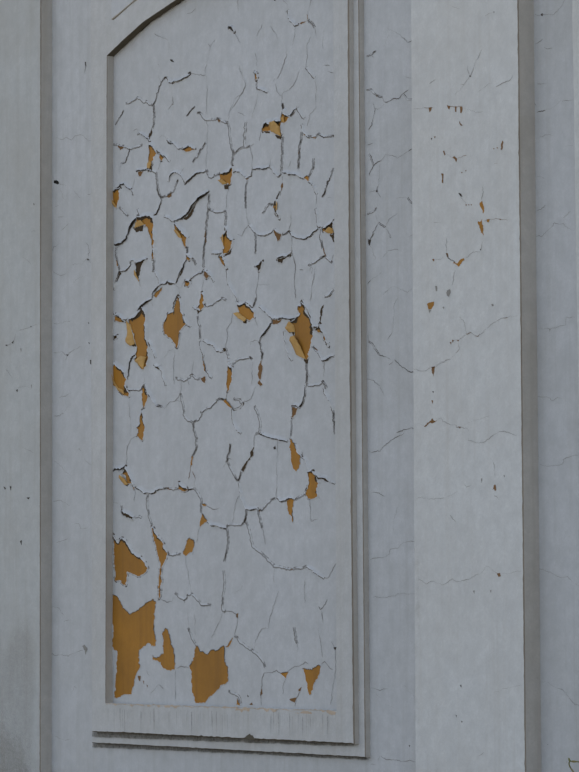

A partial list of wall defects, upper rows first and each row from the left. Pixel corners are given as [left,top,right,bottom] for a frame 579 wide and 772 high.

crack [113,247,131,291]
peeling [112,283,163,442]
peeling [112,106,197,283]
crack [153,363,224,477]
crack [115,65,318,285]
peeling [162,221,331,435]
peeling [260,103,297,172]
peeling [276,385,336,523]
crack [283,331,335,432]
crack [322,168,334,198]
peeling [108,456,336,715]
crack [163,405,335,696]